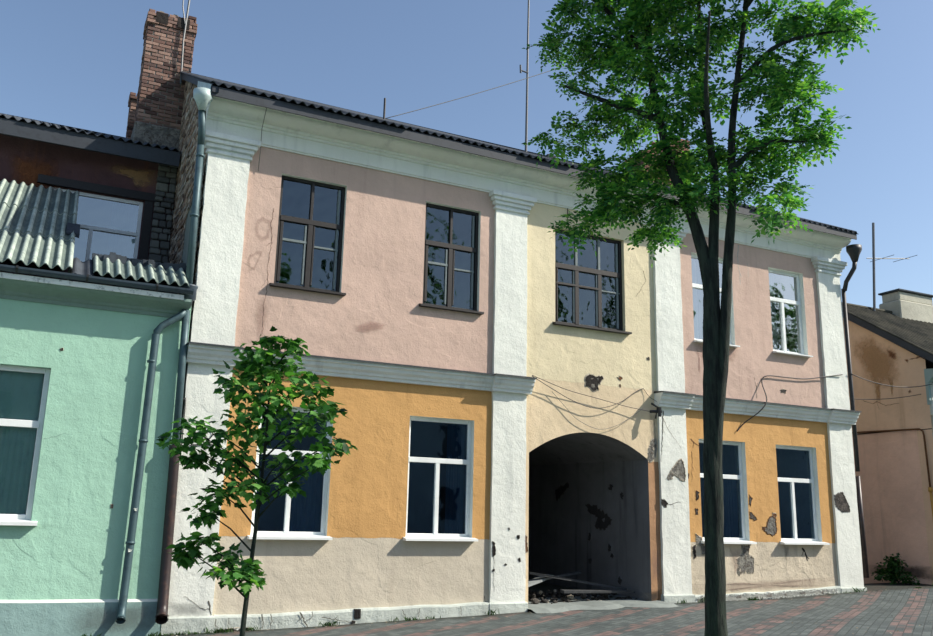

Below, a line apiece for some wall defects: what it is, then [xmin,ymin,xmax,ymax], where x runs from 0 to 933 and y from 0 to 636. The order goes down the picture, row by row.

water stain [862,341,895,398]
spalling [647,438,658,463]
spalling [667,458,689,482]
spalling [585,504,612,541]
spalling [749,495,777,537]
spalling [834,492,850,513]
spalling [691,533,705,559]
spalling [736,544,755,576]